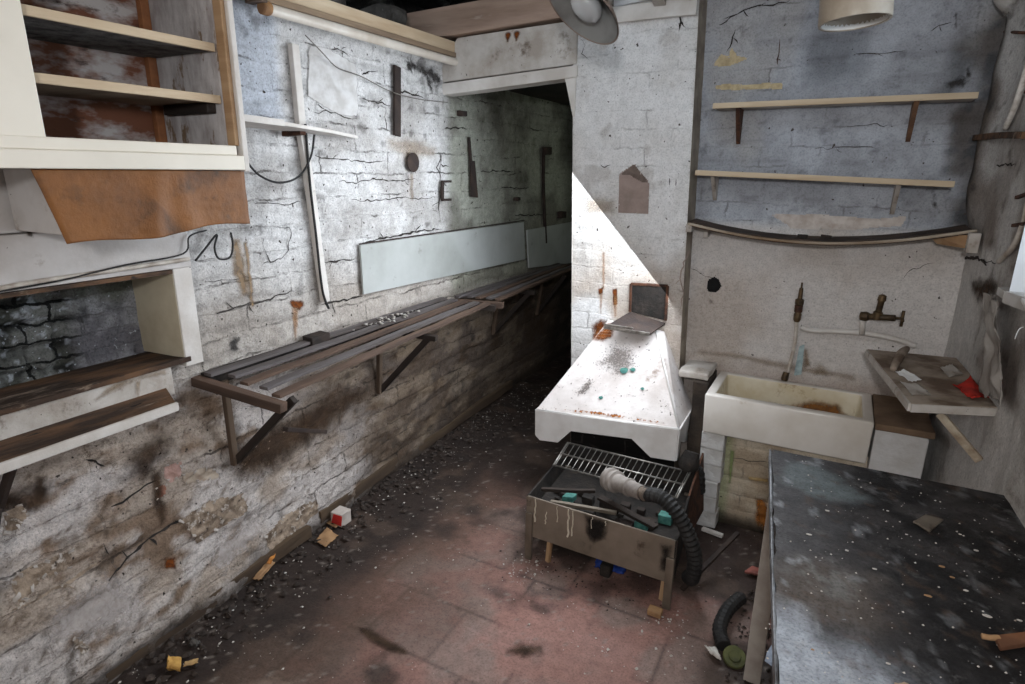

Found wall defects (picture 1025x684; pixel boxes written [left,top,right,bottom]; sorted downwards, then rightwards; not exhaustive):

crack [720,0,790,51]
crack [315,71,423,119]
mould [407,62,440,92]
crack [481,169,529,189]
crack [205,200,300,314]
crack [322,296,363,312]
corrosion [593,320,613,340]
damp [235,390,362,476]
damp [3,477,46,512]
damp [132,439,165,524]
crack [12,519,182,611]
damp [54,583,138,639]